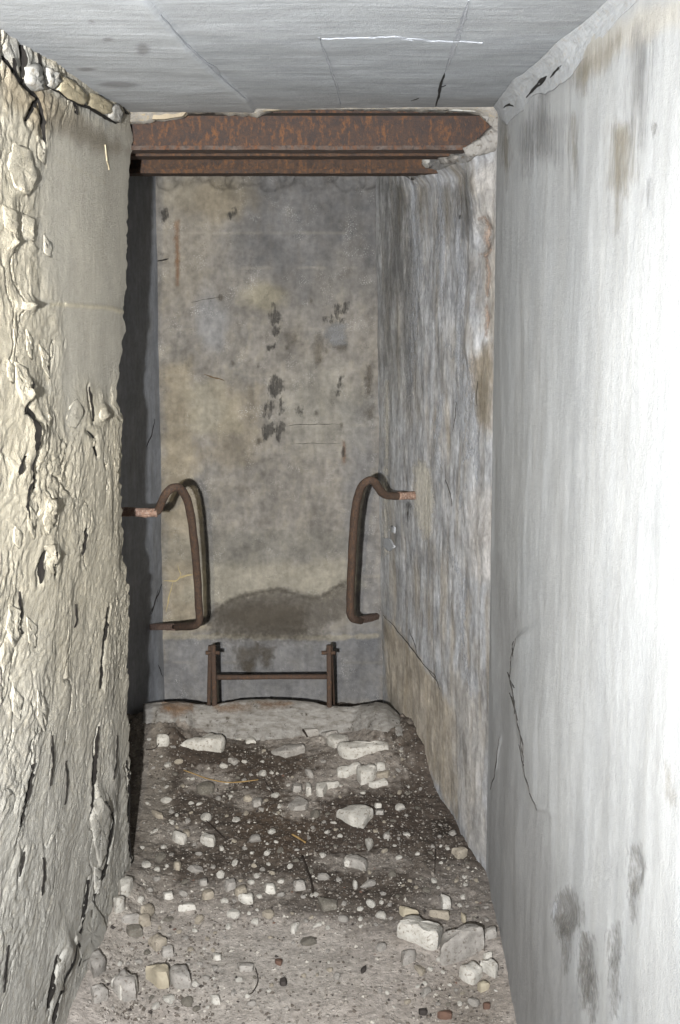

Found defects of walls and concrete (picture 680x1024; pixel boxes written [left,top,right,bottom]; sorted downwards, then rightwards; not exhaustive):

peeling [7,135,47,197]
peeling [2,205,52,258]
water stain [267,303,280,351]
peeling [6,329,50,408]
water stain [264,375,285,442]
peeling [13,496,58,574]
peeling [5,604,38,648]
peeling [12,685,23,720]
peeling [37,689,48,732]
crack [490,639,537,810]
peeling [75,901,109,963]
peeling [55,958,65,993]